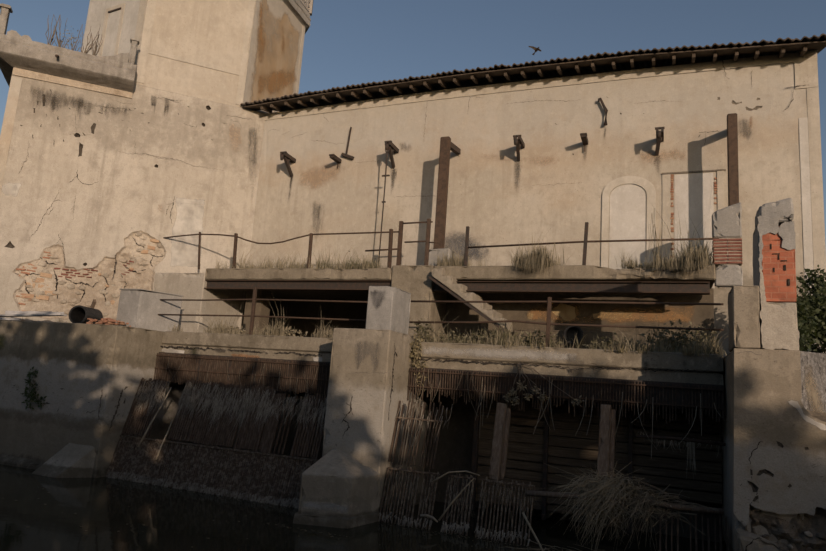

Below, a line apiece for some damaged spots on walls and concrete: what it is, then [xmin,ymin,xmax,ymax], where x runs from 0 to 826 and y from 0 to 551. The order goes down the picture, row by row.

water stain [46,93,86,109]
crack [31,170,97,236]
crack [15,234,163,302]
flaking render [13,230,167,320]
crack [28,386,128,431]
crack [161,345,322,356]
crack [348,343,708,421]
spalling [745,469,826,551]